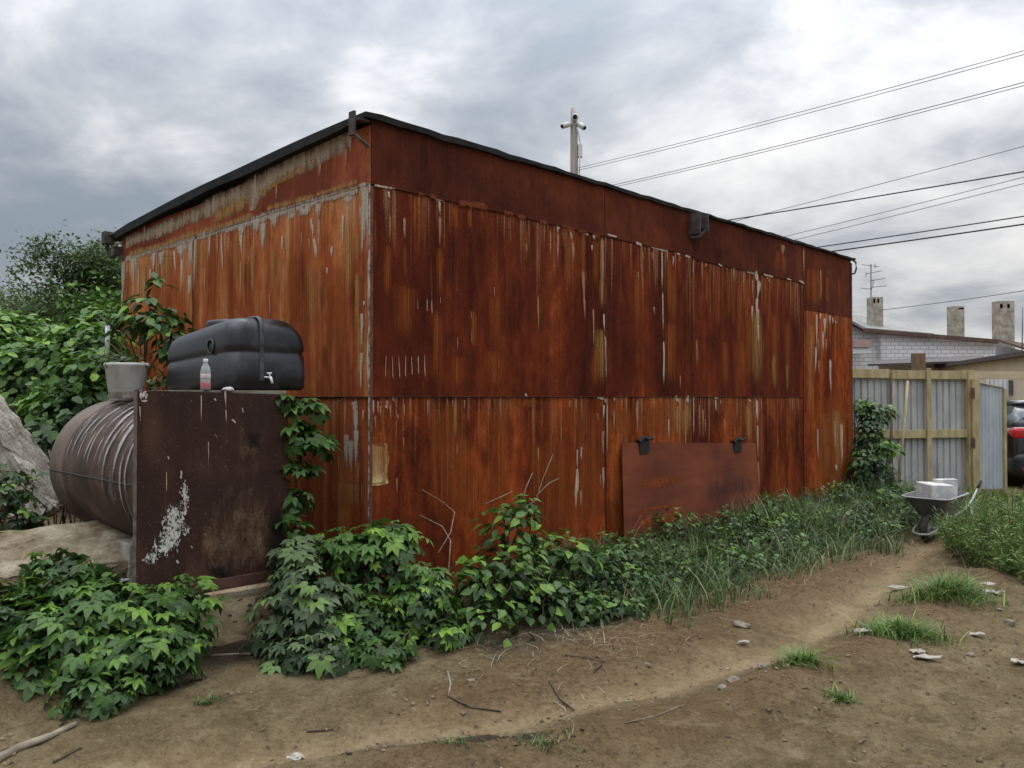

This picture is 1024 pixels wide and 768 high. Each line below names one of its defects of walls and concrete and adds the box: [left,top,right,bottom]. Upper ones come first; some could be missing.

corrosion [200,232,253,310]
corrosion [269,204,359,334]
corrosion [335,401,364,502]
corrosion [550,227,606,374]
corrosion [534,252,763,526]
corrosion [692,260,789,378]
corrosion [808,328,831,387]
corrosion [817,400,852,482]
peeling [142,456,193,564]
corrosion [202,508,284,578]